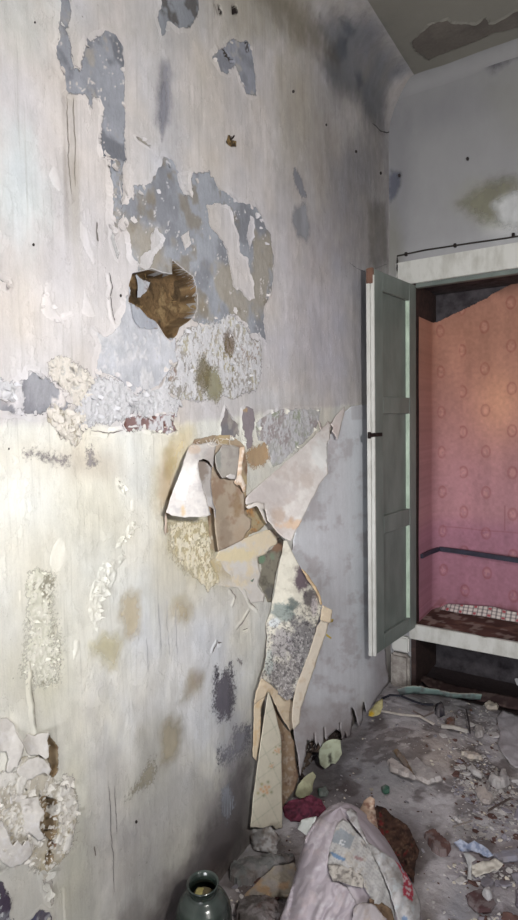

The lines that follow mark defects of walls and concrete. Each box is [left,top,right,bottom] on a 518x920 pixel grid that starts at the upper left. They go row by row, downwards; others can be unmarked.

flaking render [409,9,518,61]
peeling [0,0,321,469]
leakage [467,182,518,225]
peeling [168,520,220,592]
peeling [21,568,62,690]
flaking render [296,730,346,780]
flaking render [0,717,81,920]